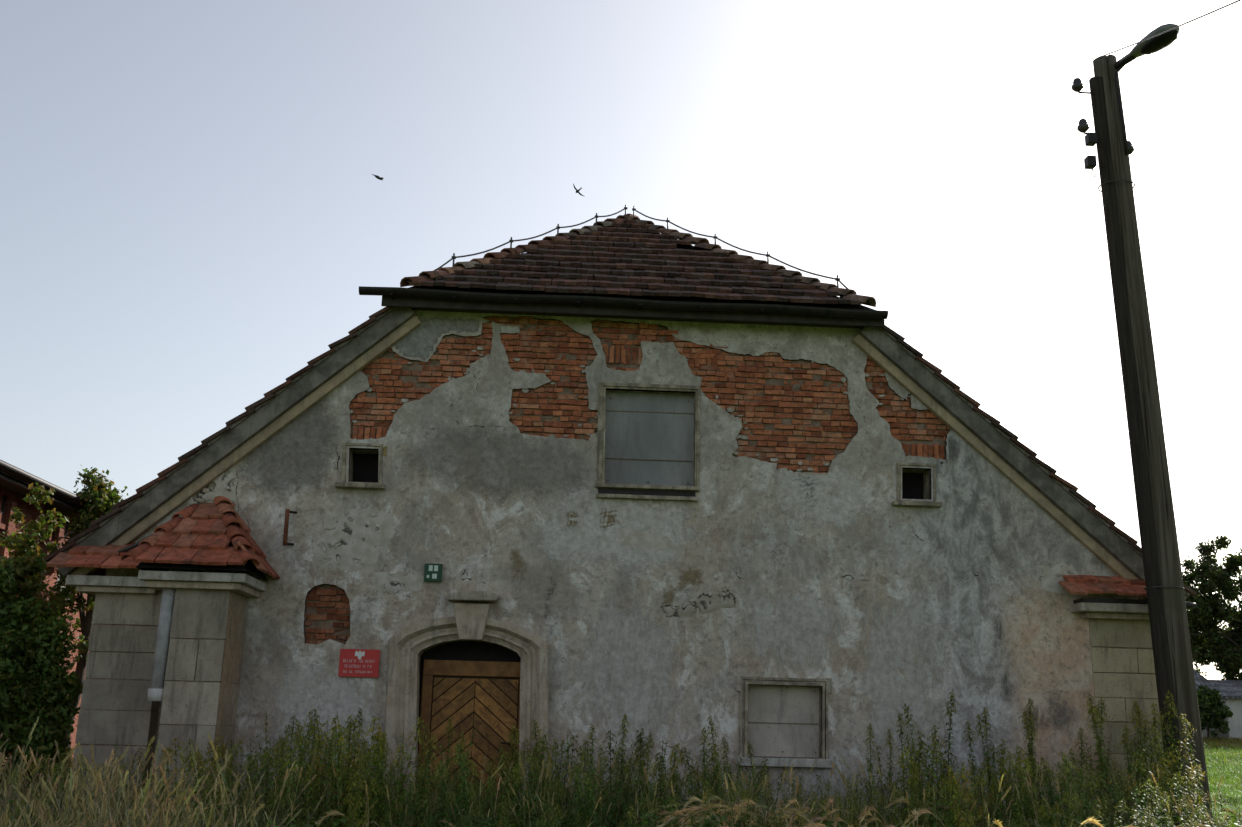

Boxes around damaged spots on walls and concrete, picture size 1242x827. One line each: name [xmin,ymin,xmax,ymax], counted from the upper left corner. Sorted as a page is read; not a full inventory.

flaking render [349,316,857,474]
flaking render [864,356,951,464]
flaking render [658,588,737,622]